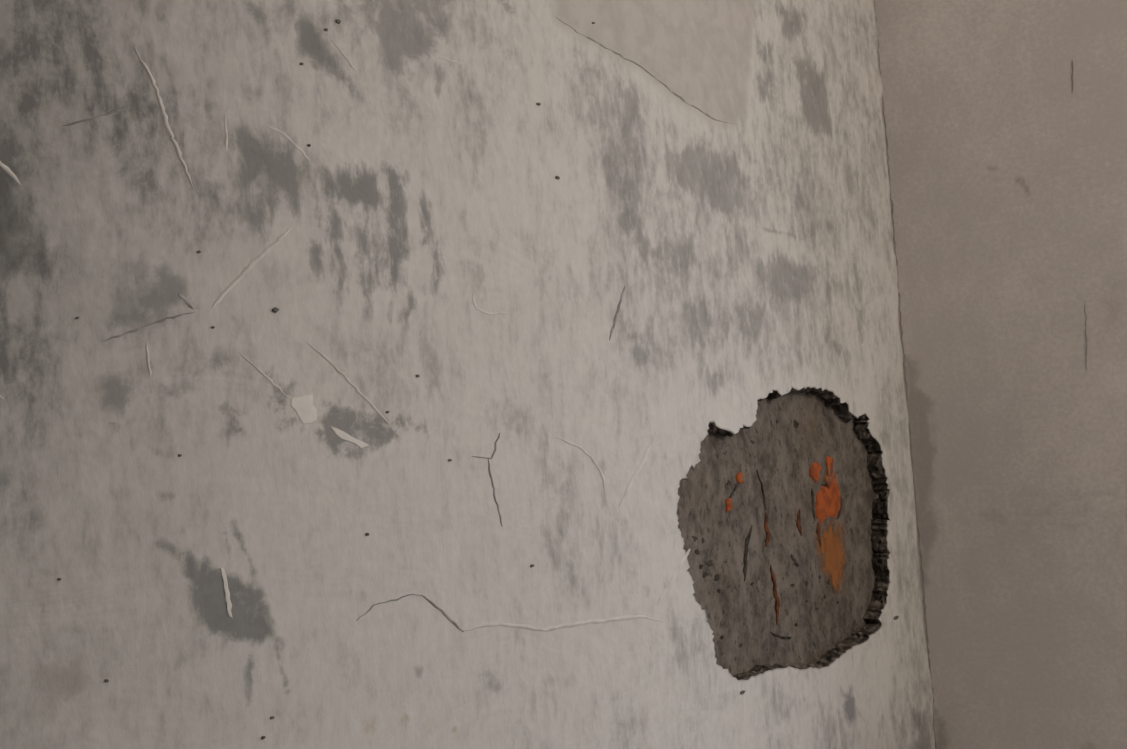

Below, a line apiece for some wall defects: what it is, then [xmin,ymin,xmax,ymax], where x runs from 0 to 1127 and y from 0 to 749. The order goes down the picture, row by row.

peeling [233,0,471,118]
crack [556,17,738,125]
flaking render [486,0,891,680]
crack [473,433,503,527]
crack [356,594,464,632]
peeling [835,670,863,742]
damp [900,686,964,749]